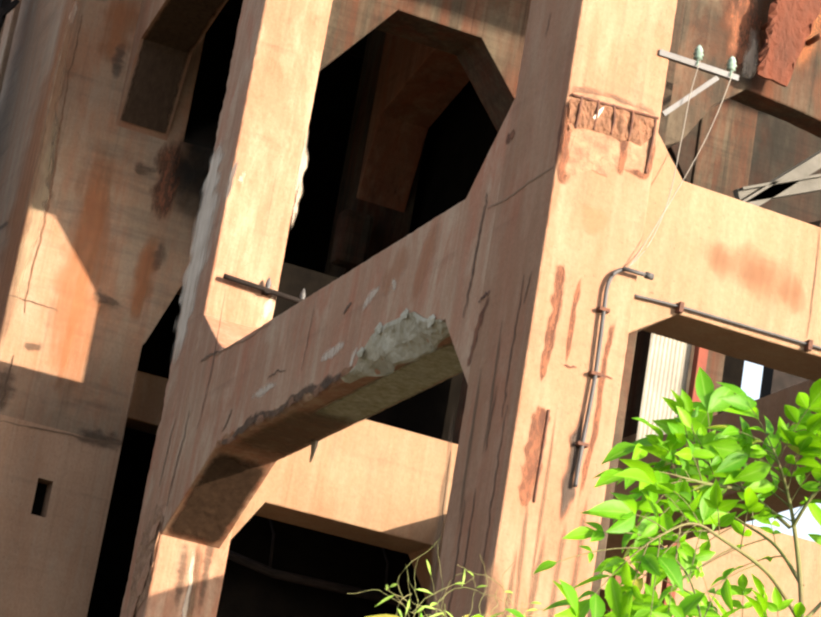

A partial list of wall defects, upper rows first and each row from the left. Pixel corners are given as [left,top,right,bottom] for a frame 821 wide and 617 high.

corrosion [152,146,181,218]
spalling [555,92,659,183]
crack [463,166,553,315]
crack [8,294,59,312]
corrosion [541,266,565,380]
corrosion [564,281,581,368]
spalling [222,308,450,445]
water stain [172,455,263,543]
corrosion [519,407,550,505]
water stain [183,554,200,617]